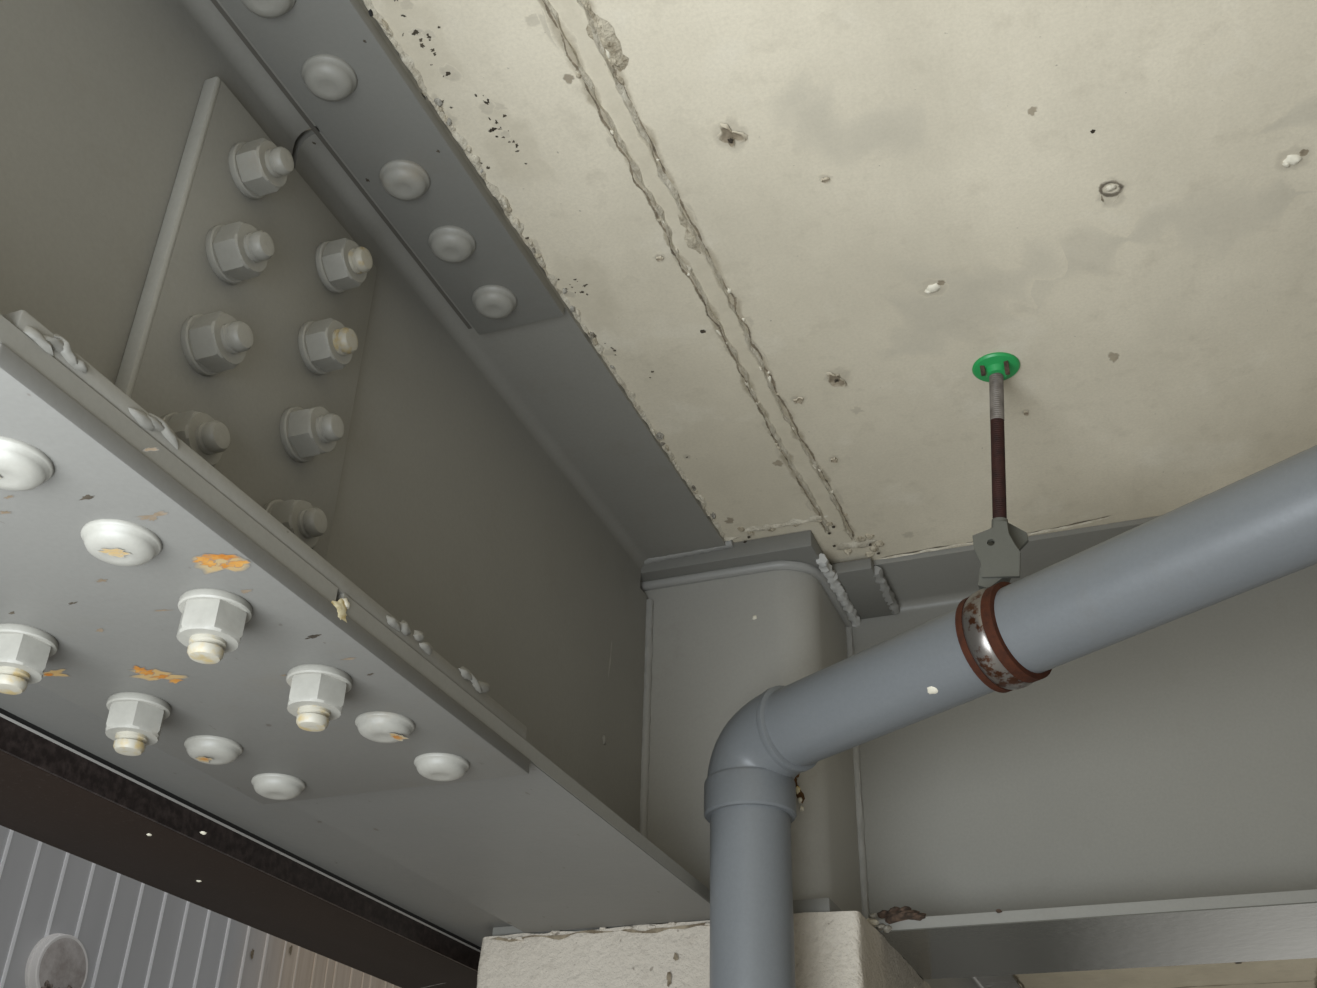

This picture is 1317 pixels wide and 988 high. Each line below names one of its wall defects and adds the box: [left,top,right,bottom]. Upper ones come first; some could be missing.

spalling [362,0,750,538]
rust [190,553,251,575]
rust [129,665,189,684]